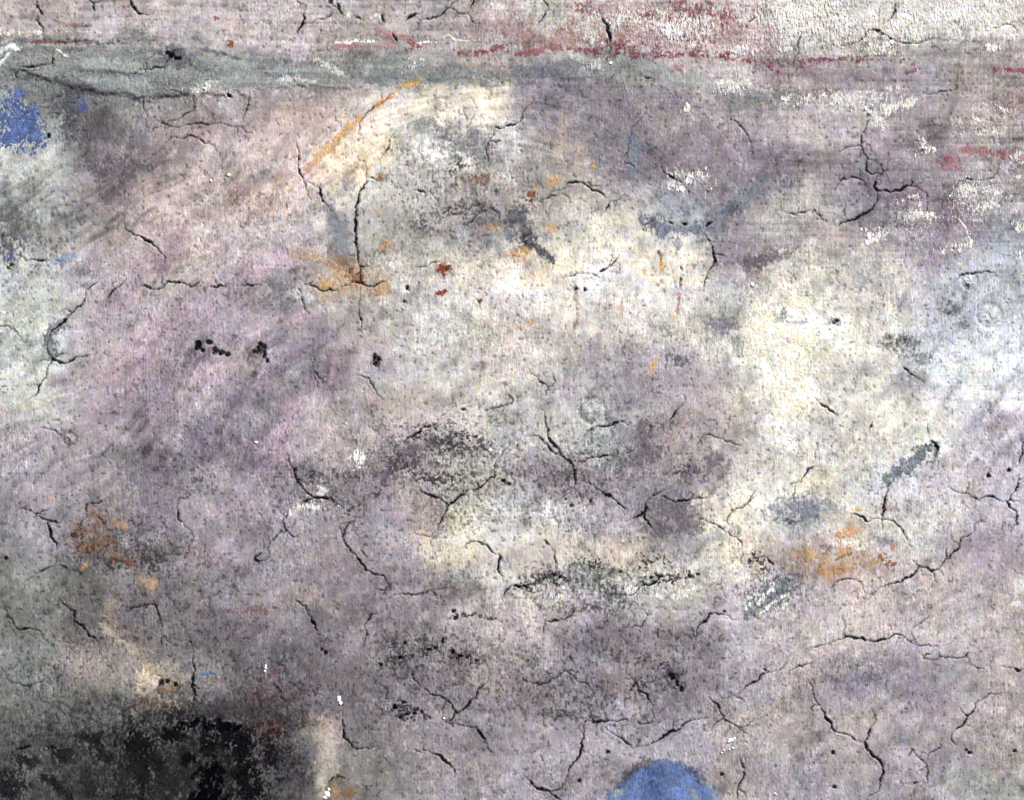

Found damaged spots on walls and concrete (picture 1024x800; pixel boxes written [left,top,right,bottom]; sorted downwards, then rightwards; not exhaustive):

rust [303,115,363,173]
rust [372,77,422,108]
crack [2,224,257,400]
crack [290,133,394,331]
rust [301,251,391,302]
rust [436,262,452,296]
rust [62,505,173,590]
crack [254,455,449,646]
crack [416,374,754,562]
rust [792,527,897,580]
crack [816,427,1024,600]
crack [522,621,1022,800]